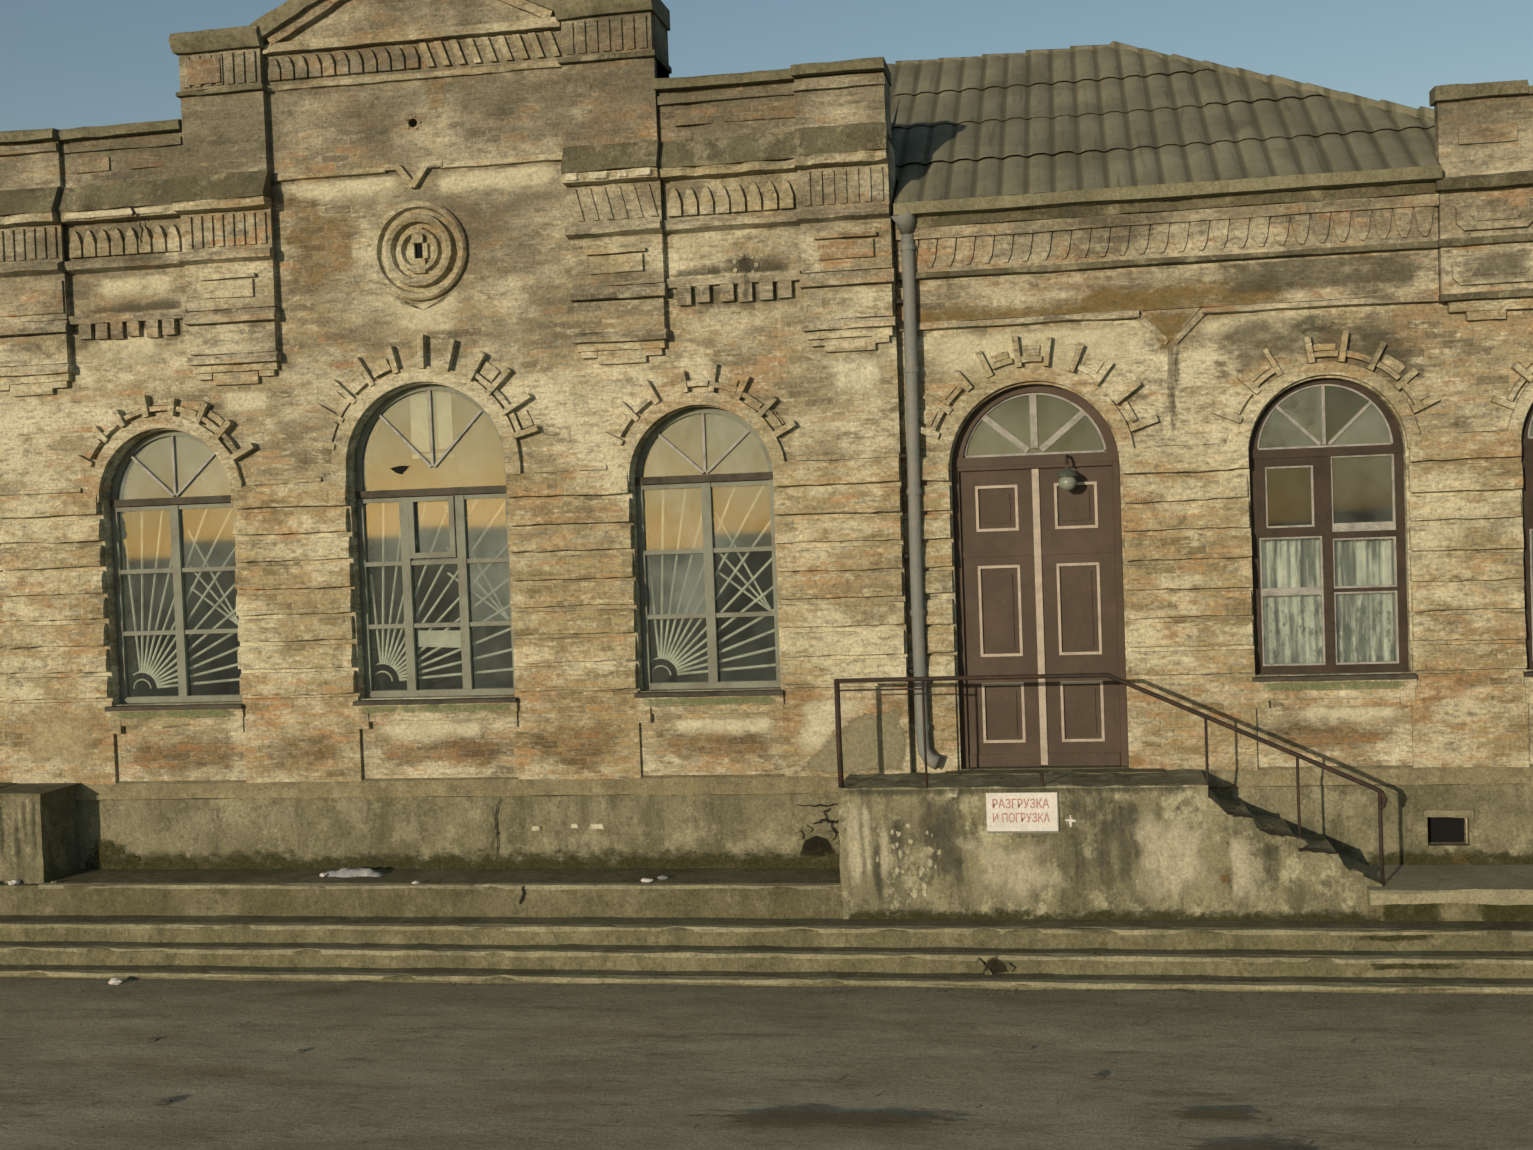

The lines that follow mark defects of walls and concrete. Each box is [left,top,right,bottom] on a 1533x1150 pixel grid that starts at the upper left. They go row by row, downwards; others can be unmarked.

leakage [846,801,1067,900]